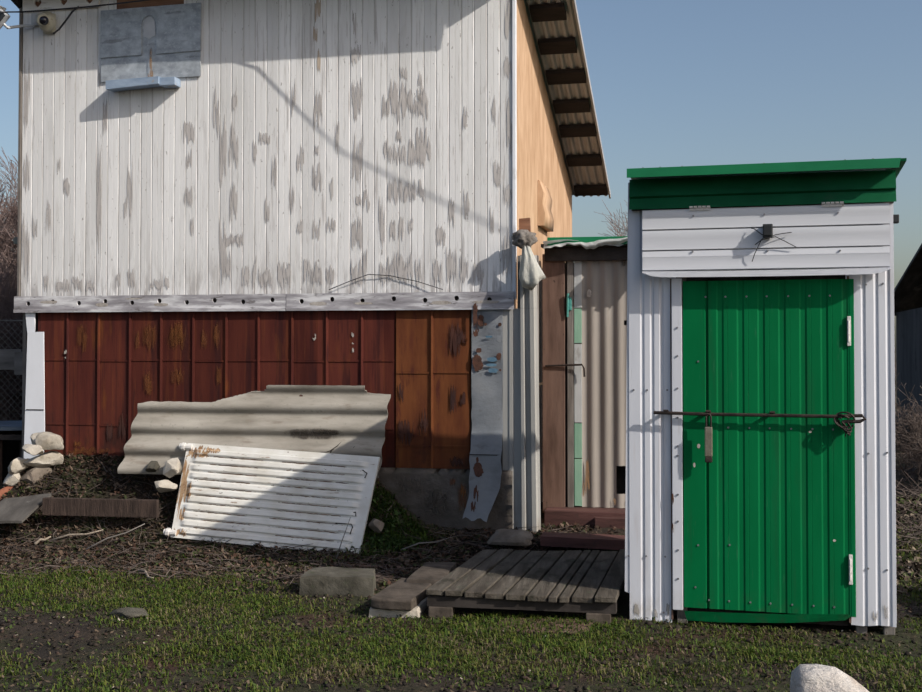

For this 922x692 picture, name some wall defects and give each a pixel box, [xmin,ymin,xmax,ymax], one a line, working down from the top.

peeling [503,58,512,79]
peeling [213,89,238,188]
peeling [351,79,363,121]
peeling [382,66,431,169]
peeling [296,145,333,201]
peeling [219,182,243,284]
peeling [289,188,336,240]
peeling [351,136,424,288]
peeling [433,194,484,287]
peeling [40,276,94,304]
peeling [304,259,334,288]
rust [450,457,484,512]